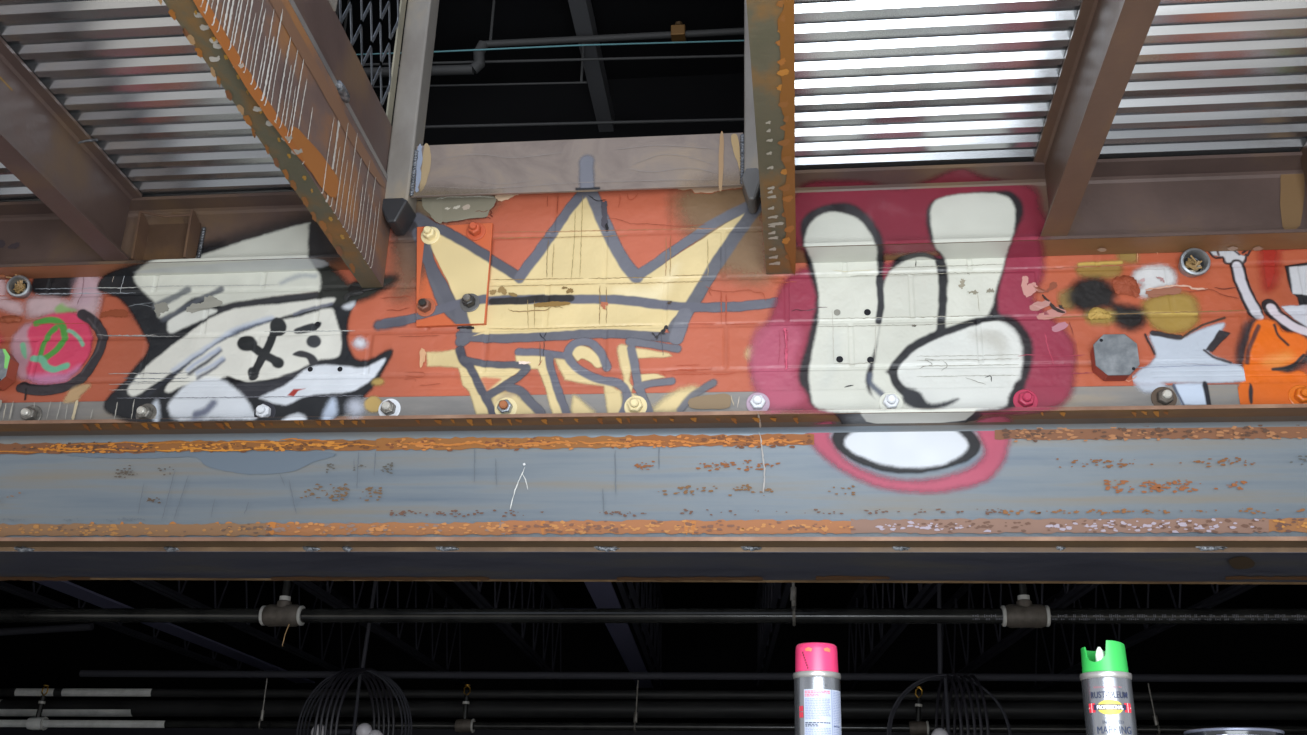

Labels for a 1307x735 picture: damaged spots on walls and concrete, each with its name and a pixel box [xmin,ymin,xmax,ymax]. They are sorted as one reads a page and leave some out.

rust [158,0,345,256]
rust [776,0,796,275]
rust [0,393,1307,537]